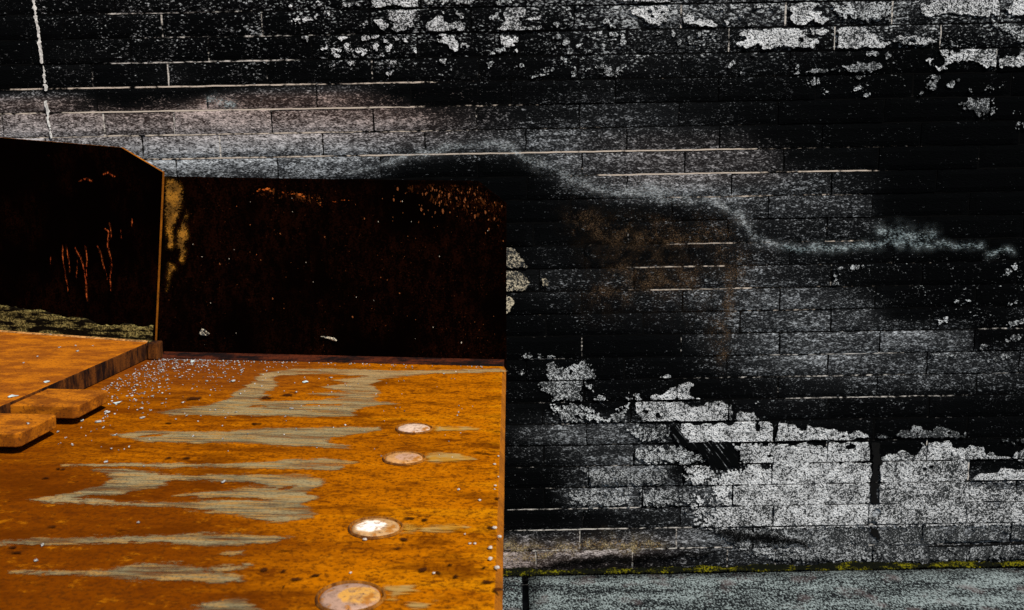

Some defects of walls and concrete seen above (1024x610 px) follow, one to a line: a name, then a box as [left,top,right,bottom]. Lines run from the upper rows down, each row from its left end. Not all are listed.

crack [32,0,52,138]
peeling [619,0,1024,119]
rust [382,187,503,234]
leakage [562,173,1013,256]
peeling [979,318,1024,362]
peeling [516,352,1024,564]
leakage [869,442,882,504]